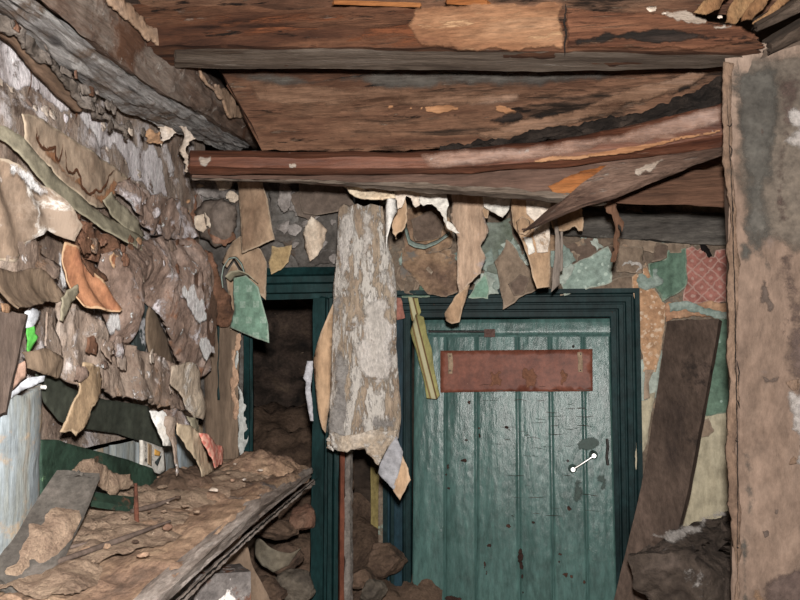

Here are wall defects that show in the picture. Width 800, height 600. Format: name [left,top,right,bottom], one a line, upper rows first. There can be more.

peeling [0,15,239,268]
peeling [55,301,188,412]
spalling [199,337,215,361]
peeling [182,250,234,327]
peeling [267,182,354,276]
peeling [346,187,420,209]
peeling [346,253,421,383]
peeling [501,240,530,266]
peeling [550,234,628,284]
damp [732,57,800,293]
damp [761,282,774,312]
damp [765,570,800,600]